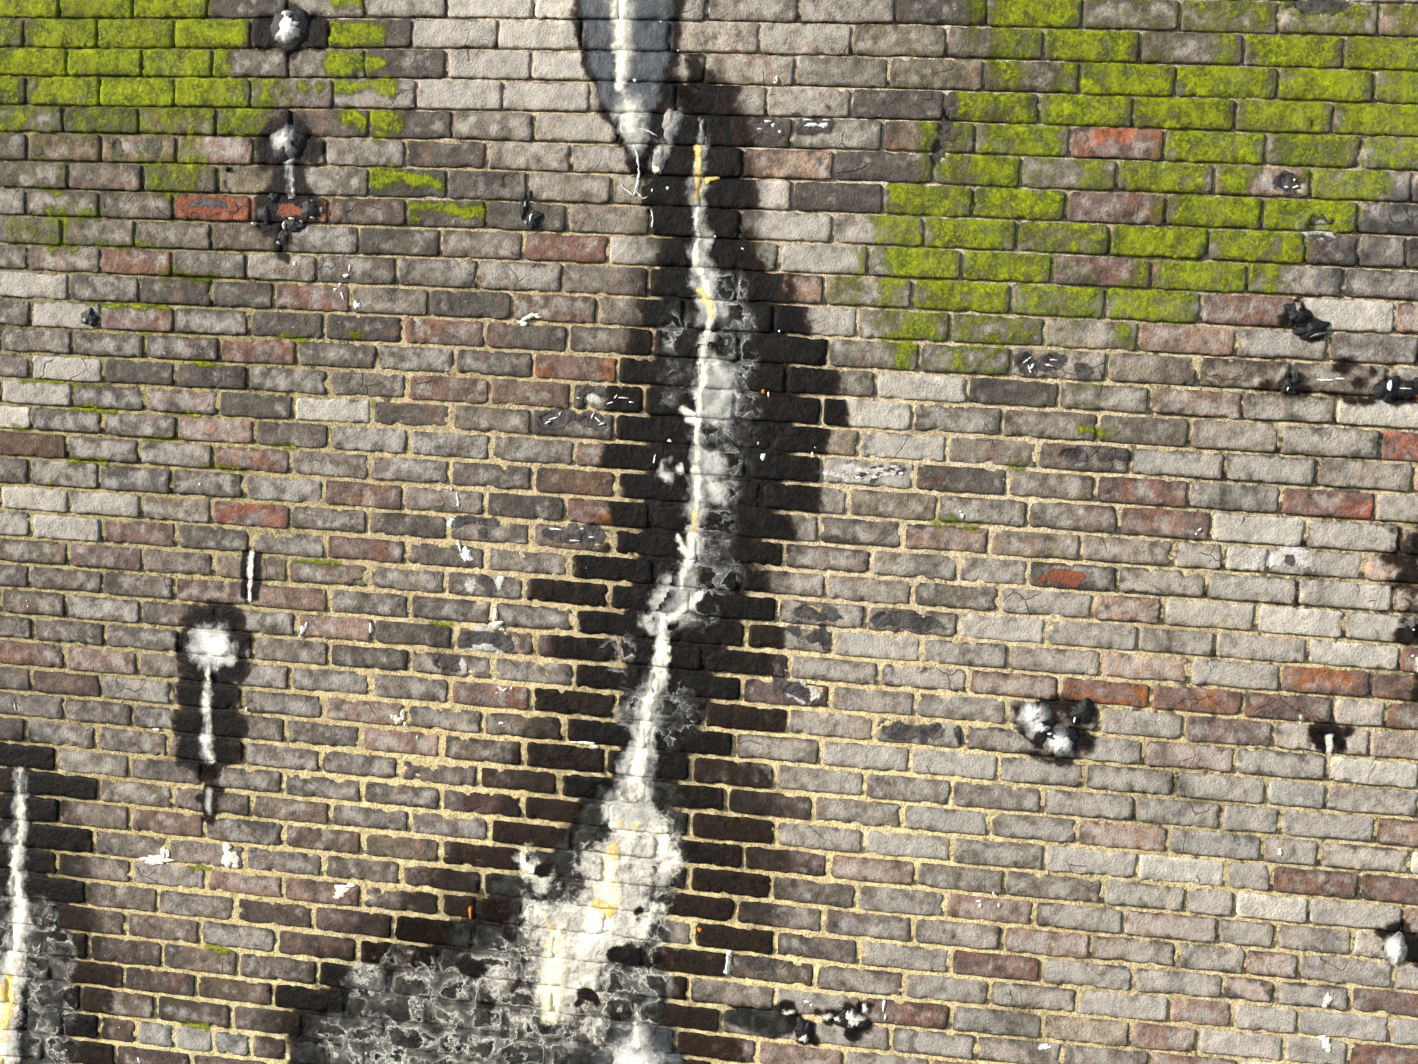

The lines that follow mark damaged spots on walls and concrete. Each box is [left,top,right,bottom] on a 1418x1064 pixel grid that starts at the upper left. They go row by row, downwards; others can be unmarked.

damp [1363,188,1418,236]
damp [266,0,849,1064]
damp [0,729,123,1064]
damp [194,784,224,825]